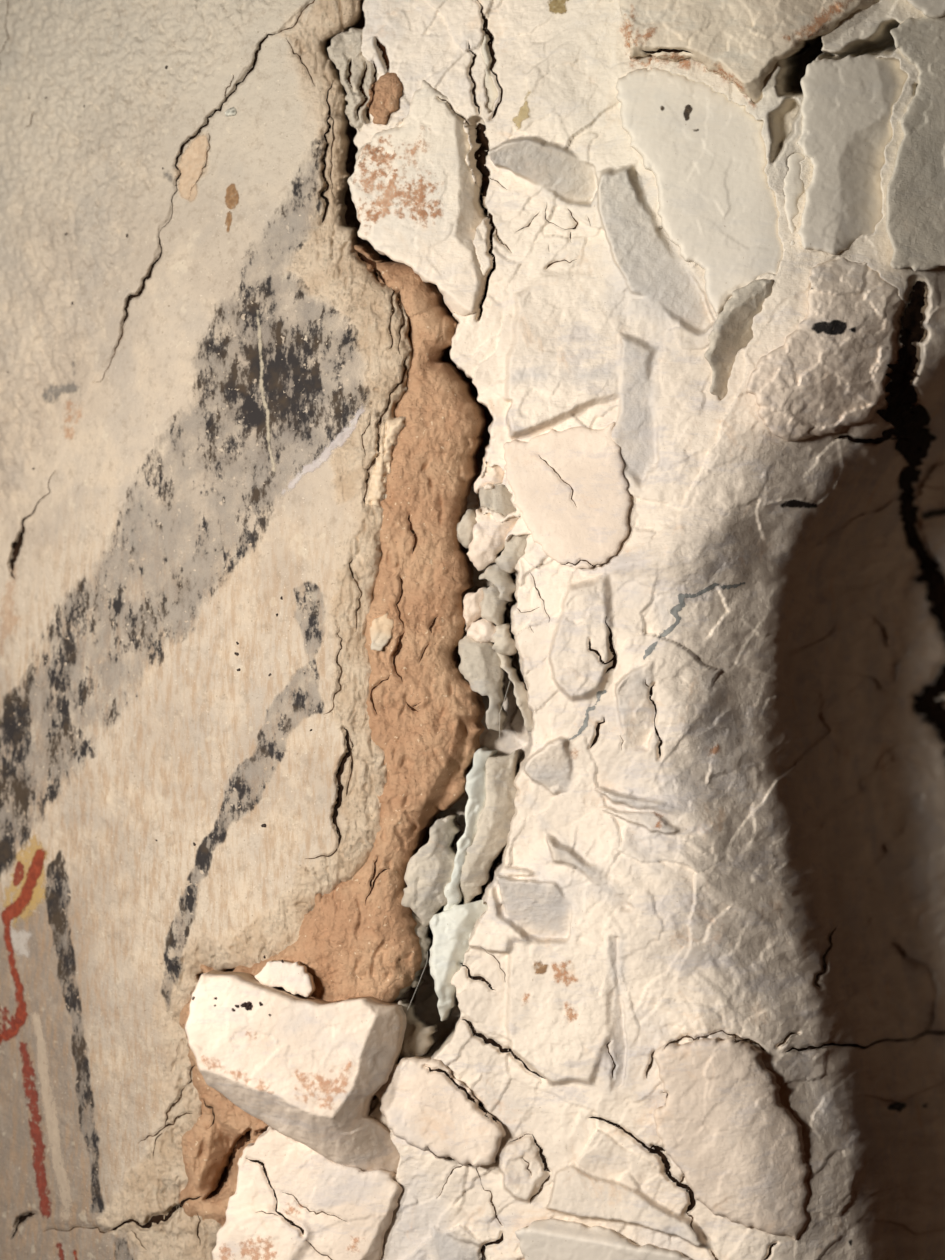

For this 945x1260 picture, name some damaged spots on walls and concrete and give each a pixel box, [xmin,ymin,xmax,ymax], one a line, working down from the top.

spalling [327,27,379,131]
peeling [178,136,208,201]
crack [94,0,389,383]
spalling [812,320,855,335]
peeling [365,417,405,506]
spalling [457,422,632,732]
crack [835,281,945,756]
spalling [395,747,521,1063]
crack [10,1065,347,1260]
crack [428,1148,503,1260]
crack [426,1066,550,1204]
crack [589,1116,718,1260]